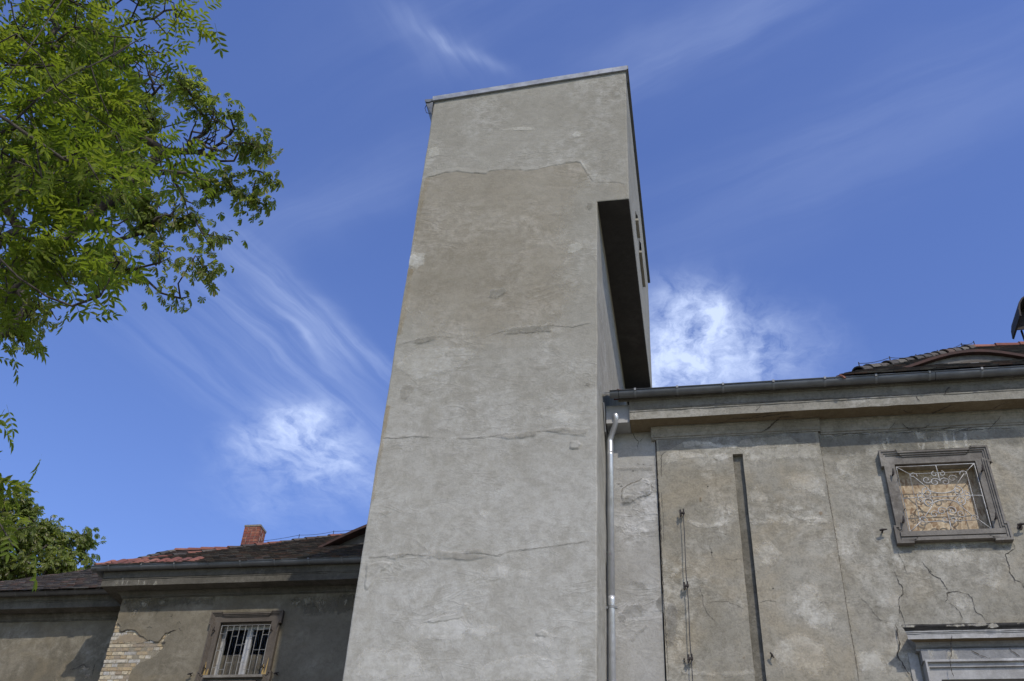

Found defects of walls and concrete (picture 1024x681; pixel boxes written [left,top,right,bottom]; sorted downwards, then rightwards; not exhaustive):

flaking render [81,619,176,681]
crack [691,387,1024,679]